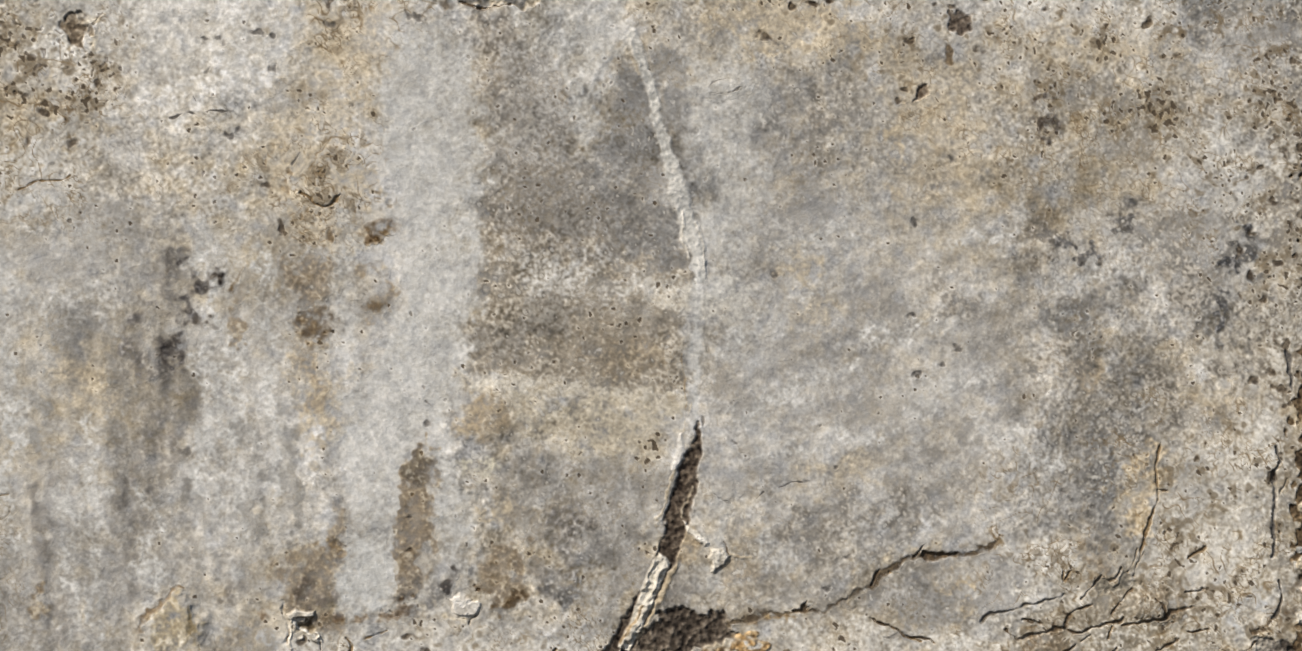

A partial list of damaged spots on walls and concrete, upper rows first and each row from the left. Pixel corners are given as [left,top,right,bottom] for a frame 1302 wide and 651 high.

spalling [404,0,541,27]
spalling [931,0,989,67]
spalling [1234,90,1302,308]
damp [0,0,334,651]
damp [215,5,614,641]
peeling [285,593,433,651]
spalling [601,414,754,651]
crack [722,541,730,557]
crack [713,480,810,505]
crack [725,529,1001,645]
crack [979,442,1226,651]
spalling [1242,343,1302,651]